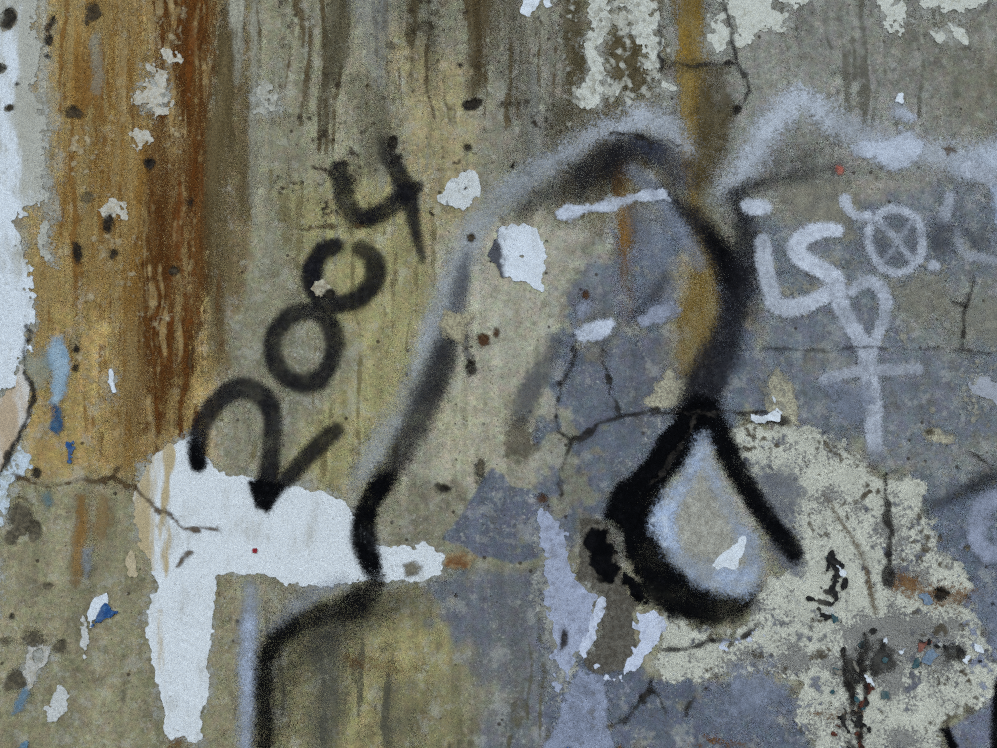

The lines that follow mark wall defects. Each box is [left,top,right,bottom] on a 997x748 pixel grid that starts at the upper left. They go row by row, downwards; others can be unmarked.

leakage [405,0,435,118]
leakage [446,0,491,121]
leakage [505,0,587,95]
peeling [566,0,677,118]
leakage [606,28,649,93]
peeling [0,0,83,546]
corrosion [61,0,221,455]
peeling [487,223,548,292]
corrosion [674,0,722,338]
crack [0,322,218,567]
crack [554,344,769,497]
spalling [577,366,997,748]